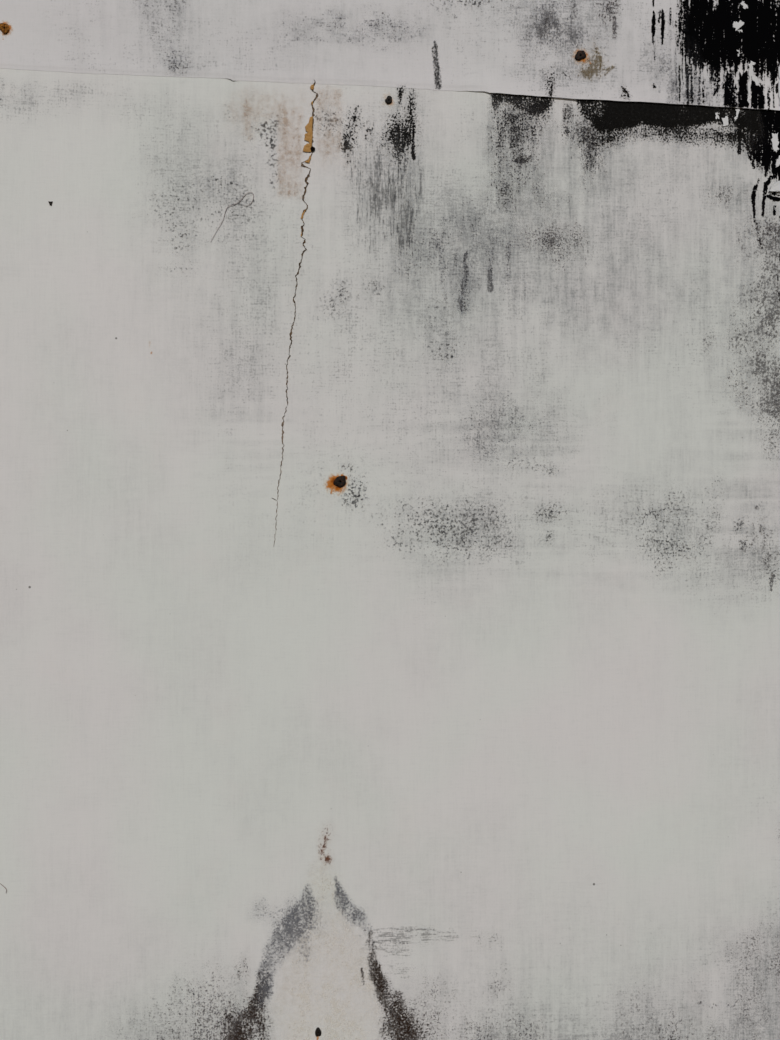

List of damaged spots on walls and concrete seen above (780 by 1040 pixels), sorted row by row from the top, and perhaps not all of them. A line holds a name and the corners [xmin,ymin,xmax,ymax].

corrosion [576,45,614,79]
peeling [651,0,780,249]
crack [273,80,318,542]
corrosion [326,474,347,493]
damp [157,885,318,1040]
damp [334,879,454,1040]